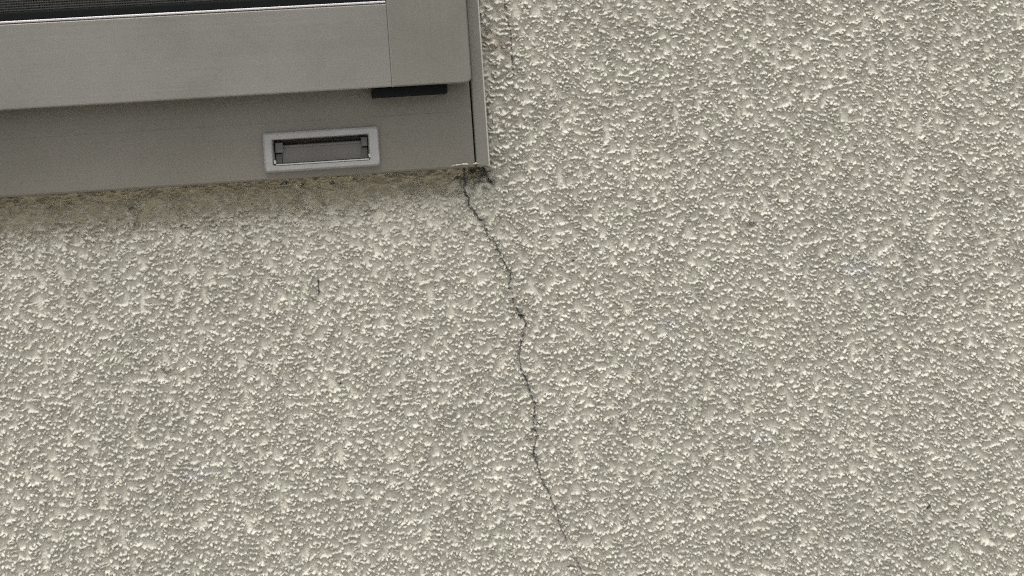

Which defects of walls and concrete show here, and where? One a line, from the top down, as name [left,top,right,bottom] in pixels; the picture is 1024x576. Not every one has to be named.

crack [451,167,583,574]